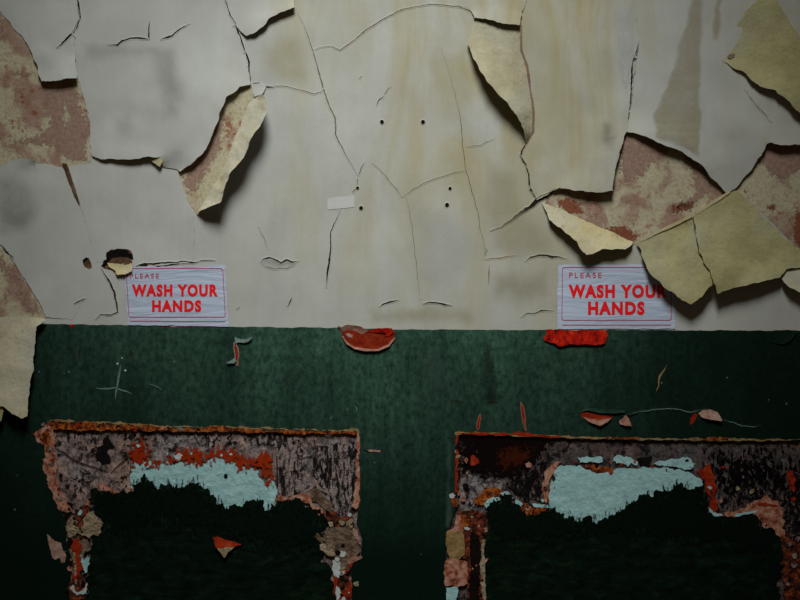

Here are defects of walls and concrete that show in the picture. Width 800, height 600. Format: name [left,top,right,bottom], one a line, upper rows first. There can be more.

crack [107,21,191,47]
crack [627,44,639,118]
crack [224,0,567,308]
peeling [429,0,800,304]
peeling [0,0,295,421]
crack [94,267,119,320]
crack [134,259,216,267]
spalling [338,325,396,351]
crack [520,309,554,318]
spalling [543,329,607,350]
spalling [33,419,383,600]
spalling [444,431,800,600]